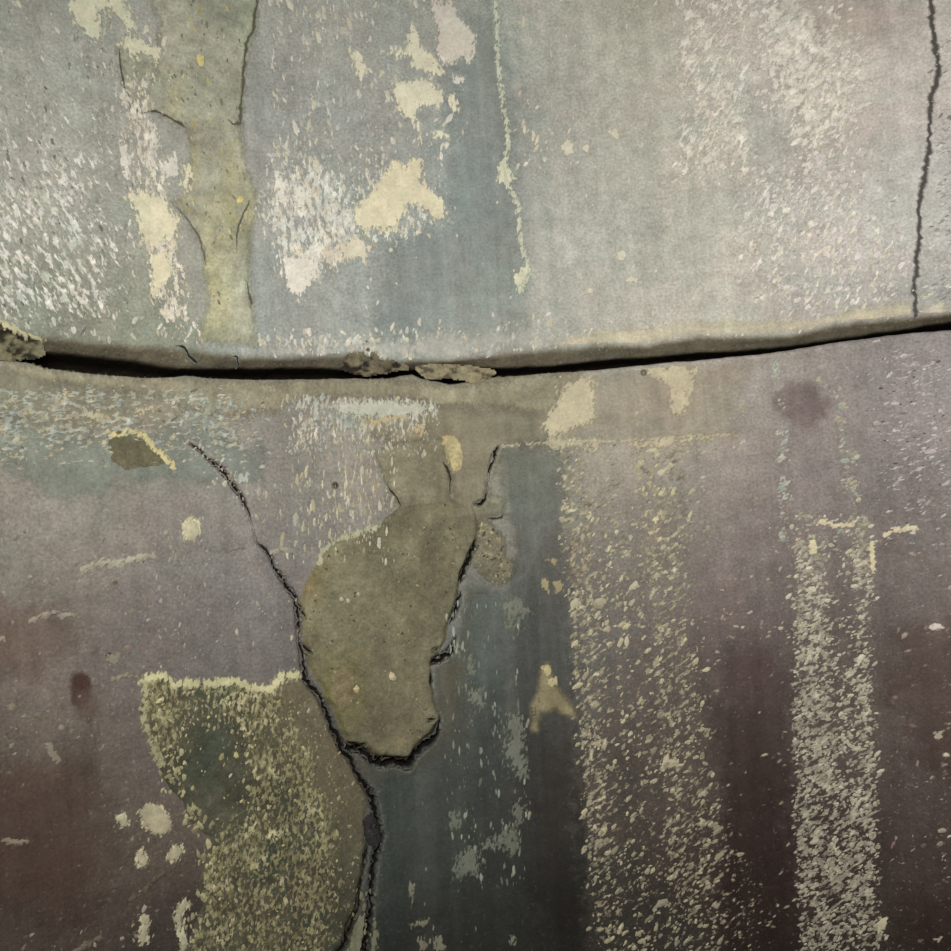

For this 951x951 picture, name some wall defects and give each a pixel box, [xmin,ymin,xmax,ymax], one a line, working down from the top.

crack [118,49,187,128]
crack [228,0,260,127]
crack [909,0,944,319]
spalling [0,320,47,361]
spalling [339,340,496,383]
spalling [103,428,177,470]
peeling [442,436,463,474]
crack [172,425,445,951]
water stain [347,361,905,951]
water stain [898,706,951,789]
peeling [137,667,382,951]
water stain [911,828,951,910]